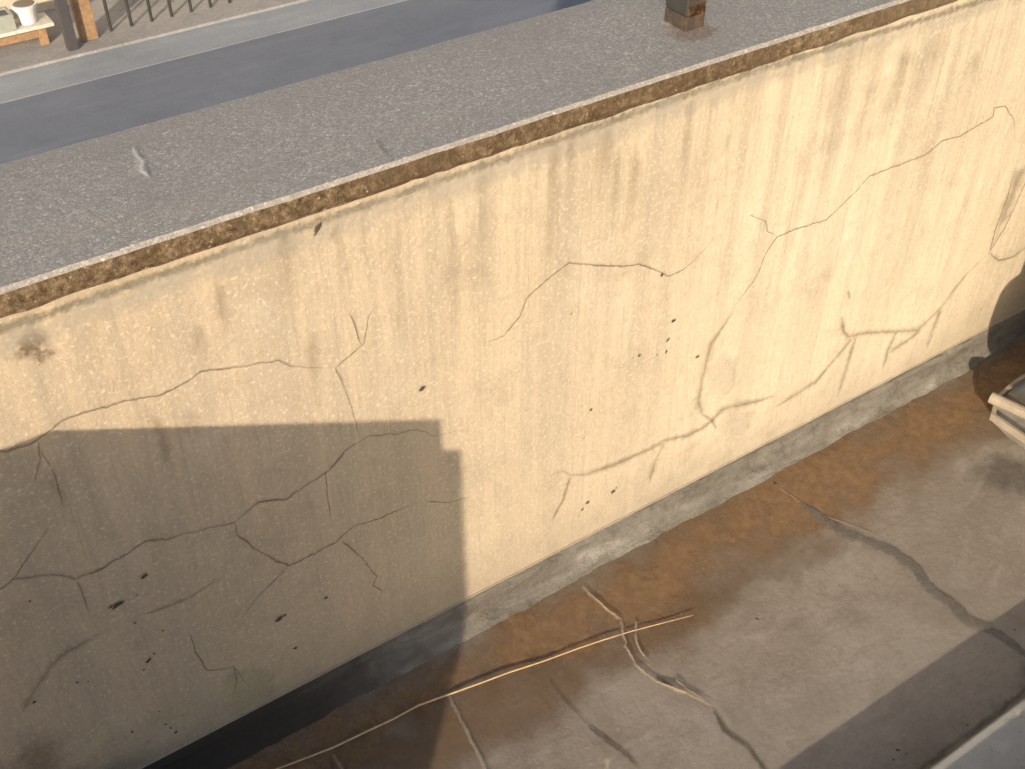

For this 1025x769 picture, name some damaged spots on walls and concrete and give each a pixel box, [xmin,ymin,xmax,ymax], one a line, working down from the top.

crack [495,263,691,340]
crack [0,368,228,500]
crack [259,415,402,510]
crack [0,532,176,607]
crack [230,523,380,601]
crack [782,490,1024,652]
crack [588,591,700,697]
crack [550,679,634,762]
crack [717,716,765,769]